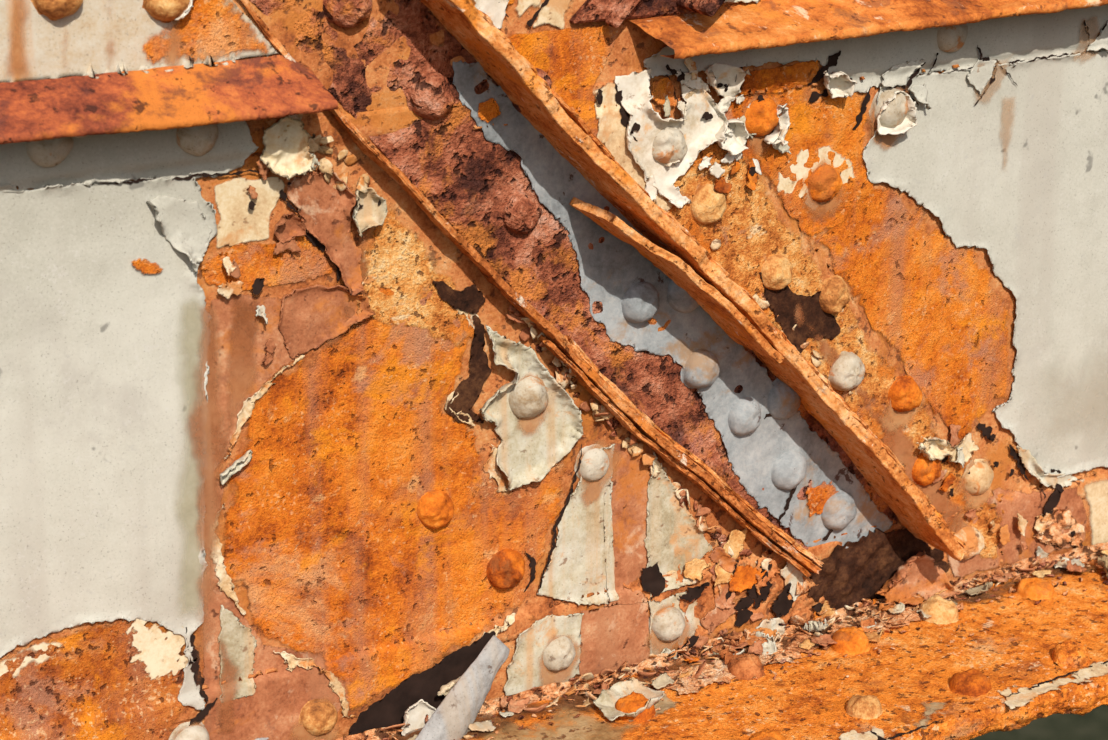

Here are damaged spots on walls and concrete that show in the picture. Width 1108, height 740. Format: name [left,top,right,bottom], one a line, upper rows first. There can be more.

corrosion [470,0,628,174]
crack [853,20,1108,130]
crack [92,169,341,281]
peeling [0,114,633,740]
corrosion [191,204,566,709]
corrosion [538,334,824,607]
peeling [432,0,1108,721]
corrosion [569,60,1012,559]
corrosion [875,551,1107,605]
corrosion [0,621,187,740]
corrosion [390,728,422,740]
corrosion [462,619,721,738]